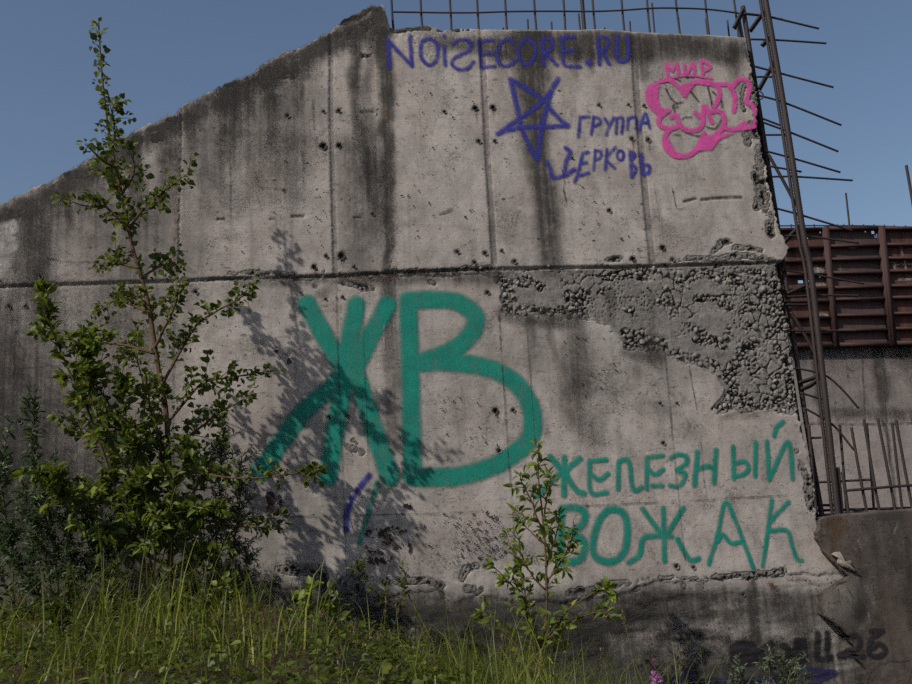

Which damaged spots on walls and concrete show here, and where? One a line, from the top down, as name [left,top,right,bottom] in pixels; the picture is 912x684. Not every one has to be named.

leakage [0,8,496,313]
spalling [675,238,776,265]
leakage [0,315,146,612]
leakage [238,579,862,684]